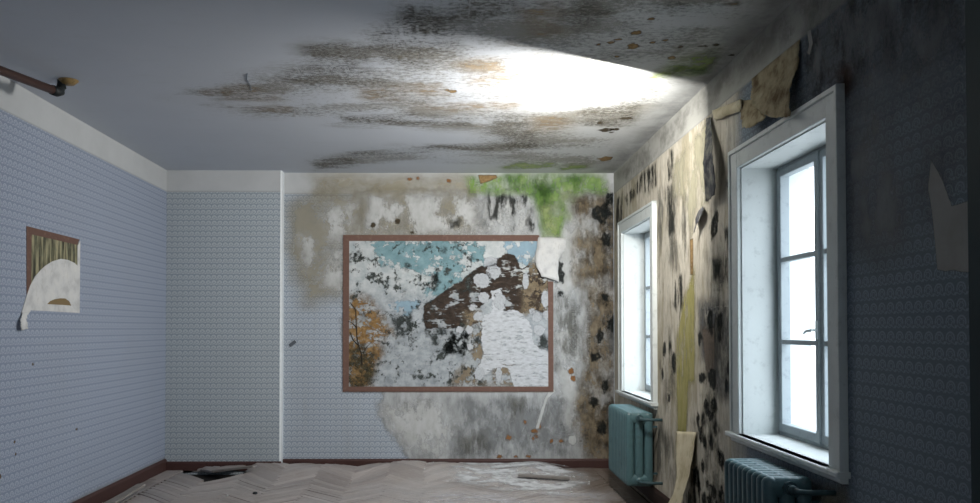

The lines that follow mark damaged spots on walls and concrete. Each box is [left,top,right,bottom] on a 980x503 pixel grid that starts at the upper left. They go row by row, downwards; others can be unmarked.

mould [286,44,388,99]
mould [380,0,519,81]
mould [341,103,568,153]
mould [582,105,636,126]
leakage [293,152,656,459]
flaking render [346,175,614,459]
leakage [653,151,729,503]
peeling [668,431,696,503]